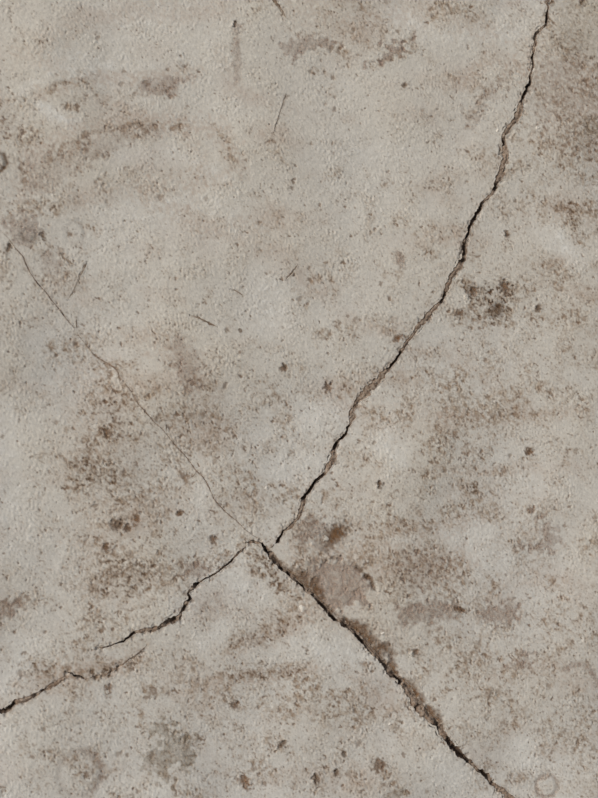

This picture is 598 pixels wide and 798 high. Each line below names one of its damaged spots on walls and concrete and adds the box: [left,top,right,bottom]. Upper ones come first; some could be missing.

crack [0,228,517,798]
crack [267,0,551,551]